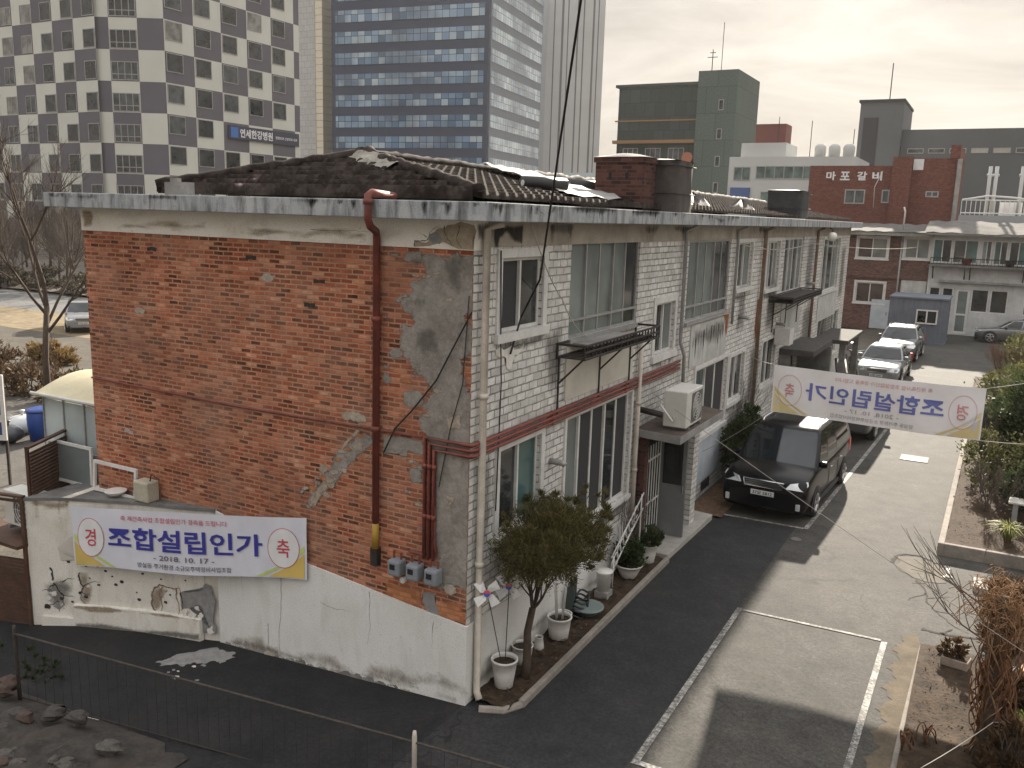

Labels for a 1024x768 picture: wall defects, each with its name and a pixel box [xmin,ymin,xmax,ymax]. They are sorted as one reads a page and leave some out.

spalling [136,578,216,635]